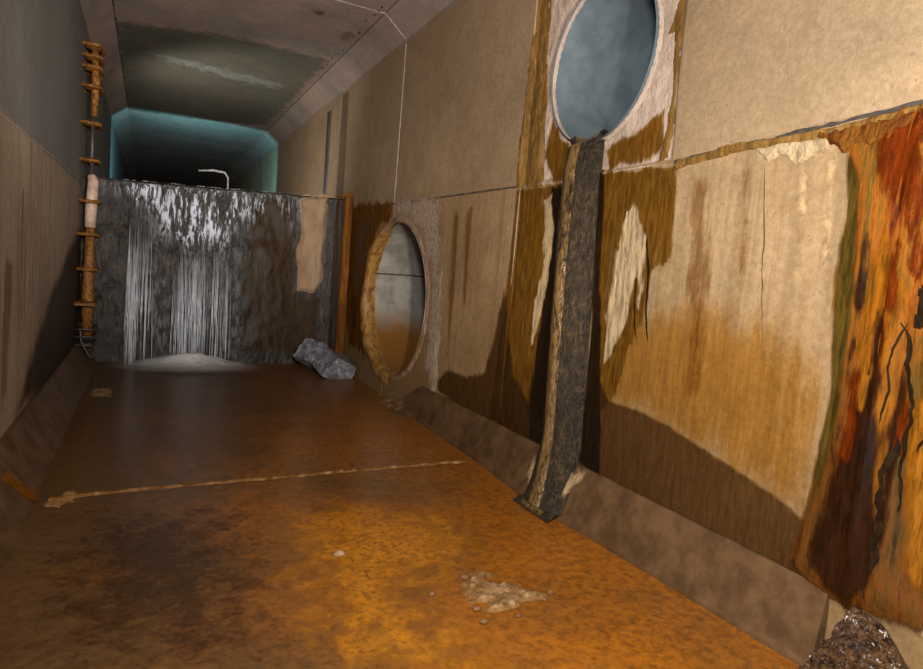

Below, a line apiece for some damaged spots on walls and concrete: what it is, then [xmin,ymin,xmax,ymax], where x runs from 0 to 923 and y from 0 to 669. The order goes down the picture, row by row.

spalling [516,0,580,189]
spalling [602,0,923,174]
damp [24,231,82,397]
peeling [395,193,443,392]
peeling [531,195,554,345]
peeling [603,206,646,363]
rust [789,107,923,633]
crack [868,285,923,574]